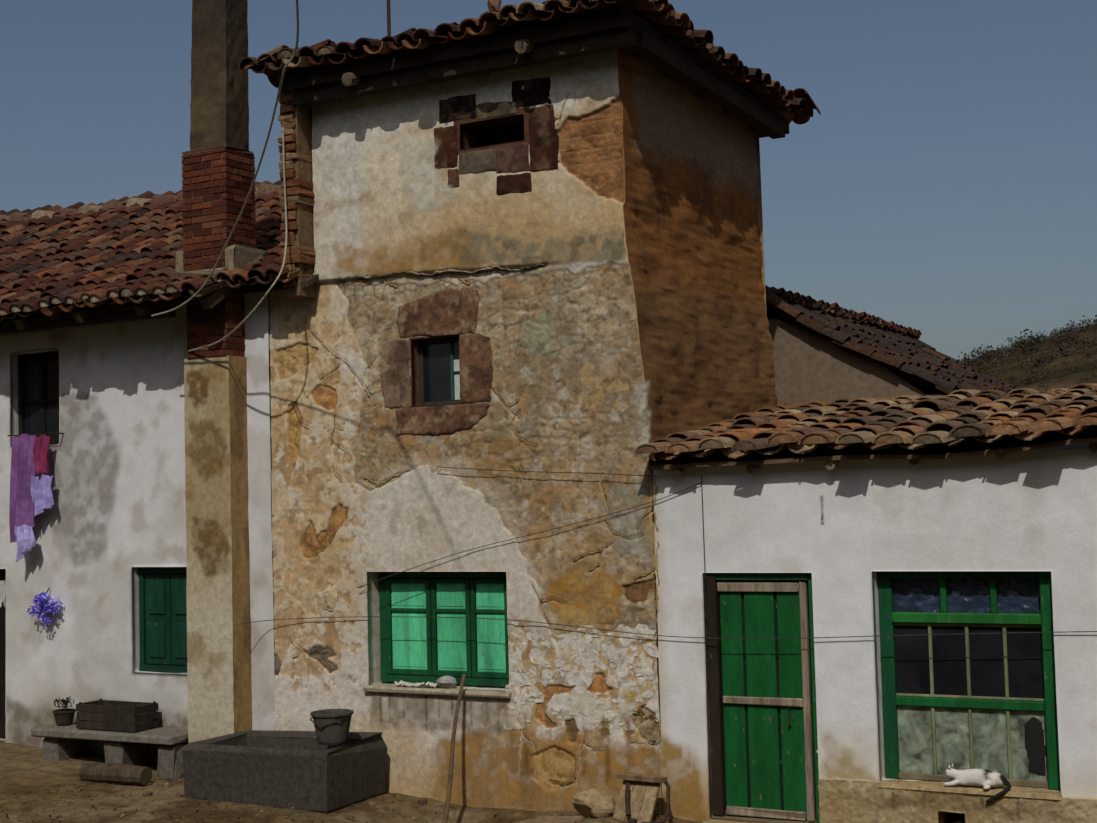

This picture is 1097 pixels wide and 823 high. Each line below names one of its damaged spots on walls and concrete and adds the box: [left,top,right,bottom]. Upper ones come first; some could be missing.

leakage [375,230,474,274]
spalling [278,343,318,379]
leakage [188,371,207,406]
spalling [311,385,337,410]
leakage [190,422,226,476]
spalling [288,402,303,471]
spalling [300,504,348,558]
crack [573,472,660,625]
crack [531,584,564,642]
peeling [501,621,660,787]